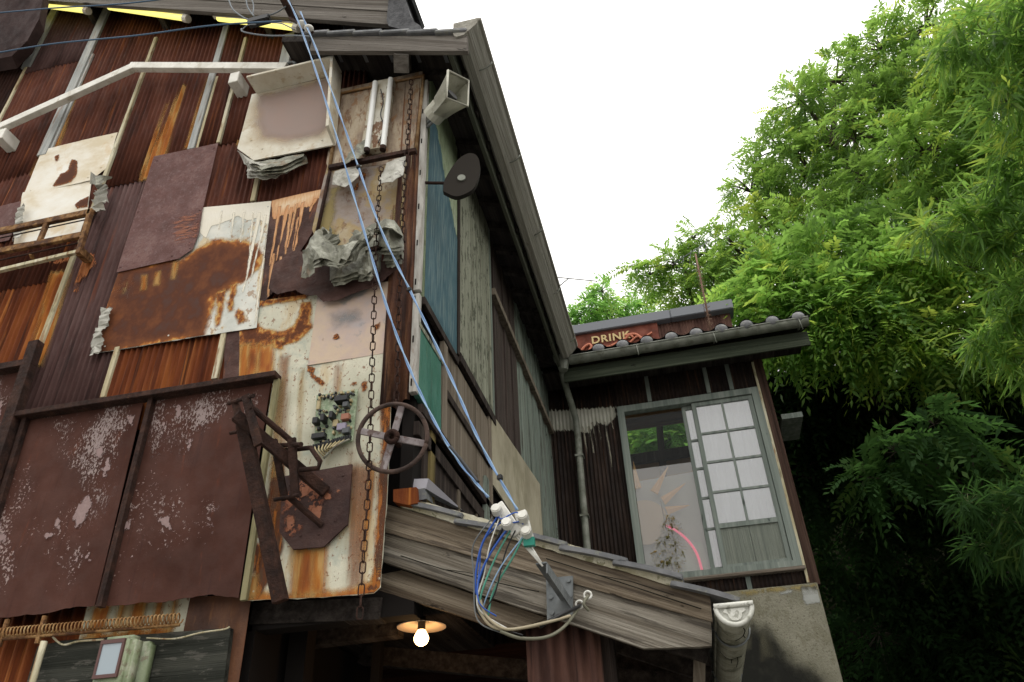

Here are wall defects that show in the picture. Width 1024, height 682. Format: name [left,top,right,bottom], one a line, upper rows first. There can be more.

corrosion [53,101,78,186]
corrosion [141,85,186,180]
corrosion [100,213,312,413]
peeling [148,388,259,454]
corrosion [307,365,325,386]
peeling [0,460,35,585]
peeling [29,405,135,585]
peeling [115,470,215,558]
corrosion [268,407,390,598]
corrosion [248,543,271,600]